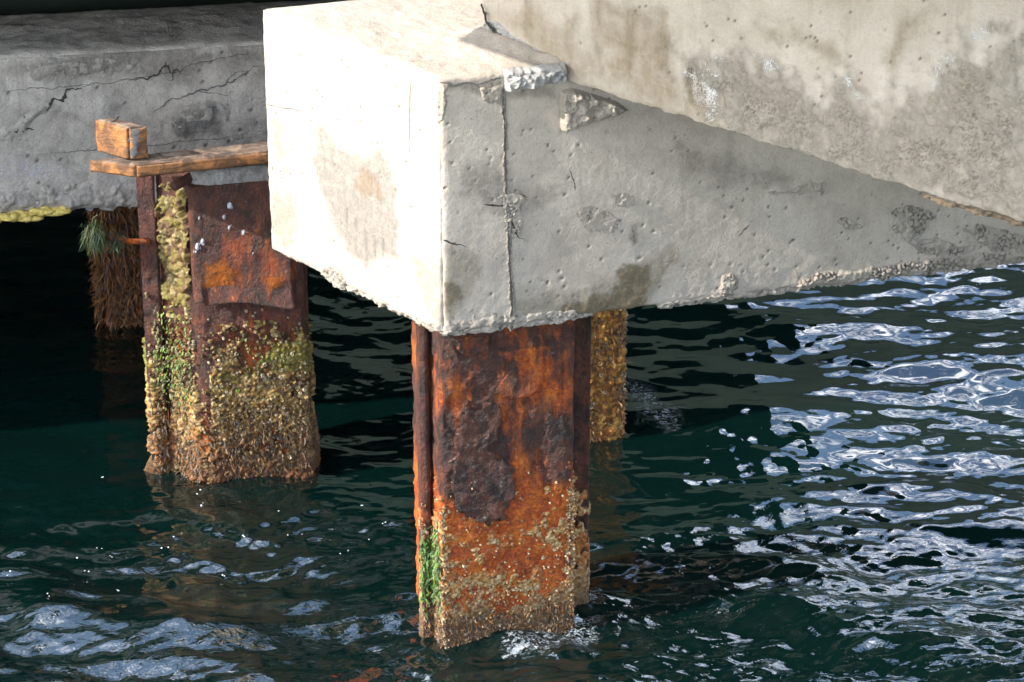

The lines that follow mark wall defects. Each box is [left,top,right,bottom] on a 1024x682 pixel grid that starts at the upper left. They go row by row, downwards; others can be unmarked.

crack [481,3,502,35]
crack [0,52,258,133]
spalling [559,87,628,132]
leakage [606,33,725,124]
spalling [656,193,1024,309]